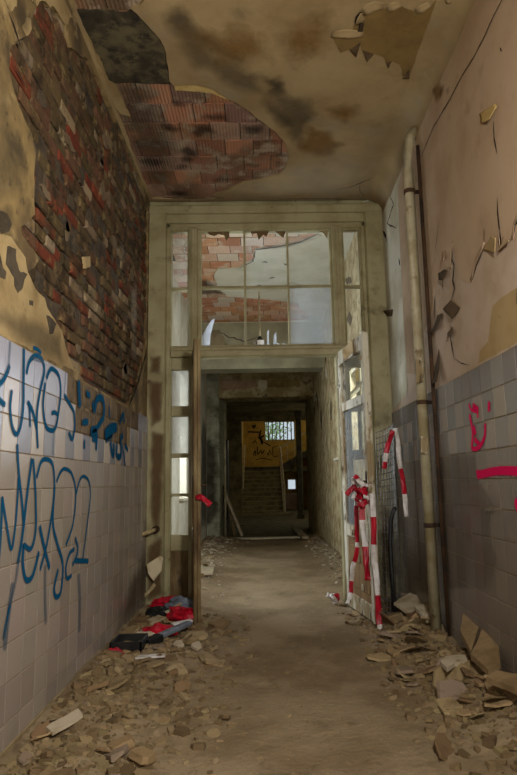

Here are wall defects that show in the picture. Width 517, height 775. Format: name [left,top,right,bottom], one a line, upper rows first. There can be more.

peeling [331,0,451,79]
flaking render [0,0,289,445]
peeling [382,0,517,409]
flaking render [202,234,322,345]
peeling [152,434,163,526]
flaking render [201,427,216,522]